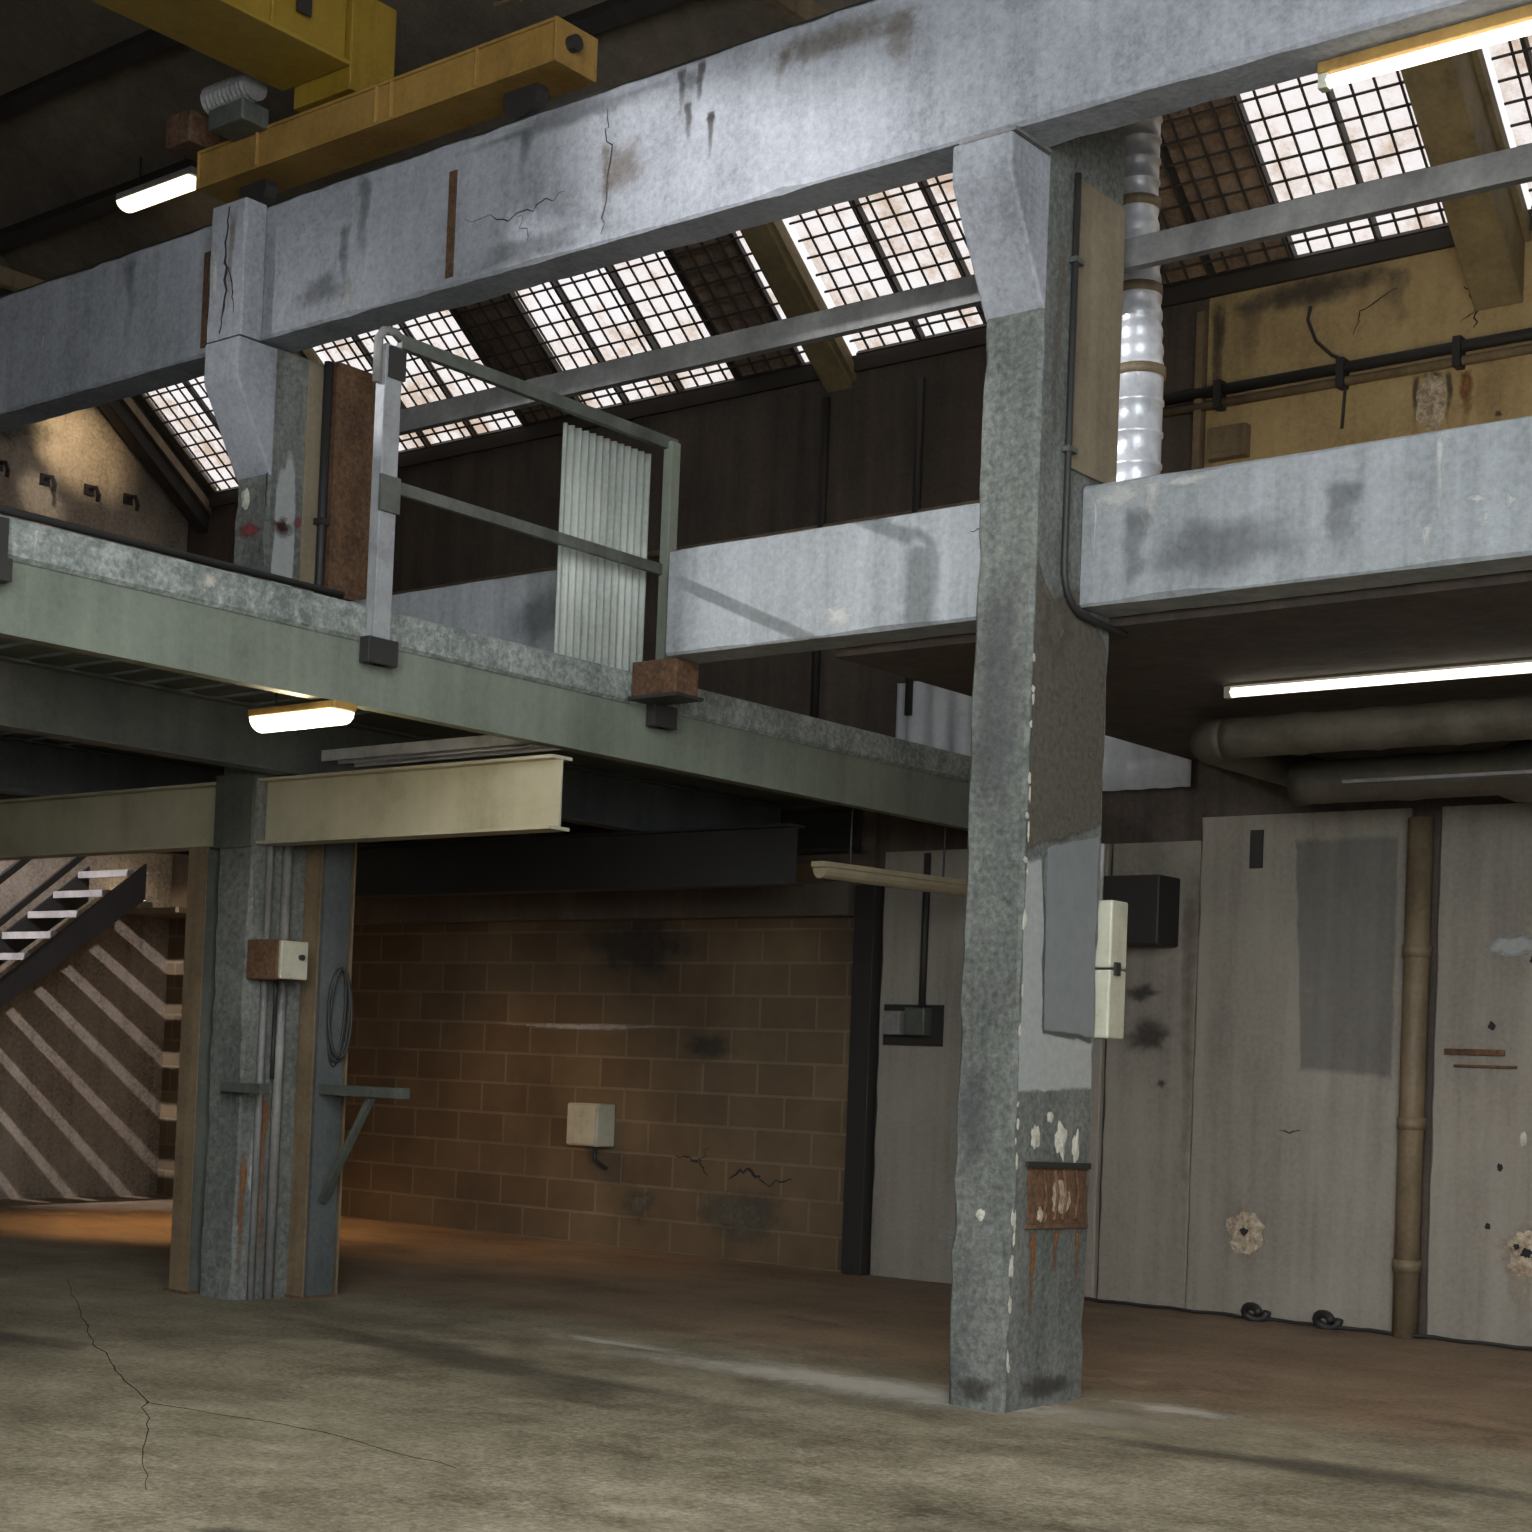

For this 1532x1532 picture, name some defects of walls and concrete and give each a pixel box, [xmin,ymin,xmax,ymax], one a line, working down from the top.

leakage [679,62,714,135]
crack [601,109,613,232]
spalling [1413,372,1453,431]
peeling [1009,561,1106,1277]
crack [675,1148,793,1187]
spalling [1226,1210,1265,1258]
spalling [1504,1230,1532,1277]
crack [67,1279,455,1490]